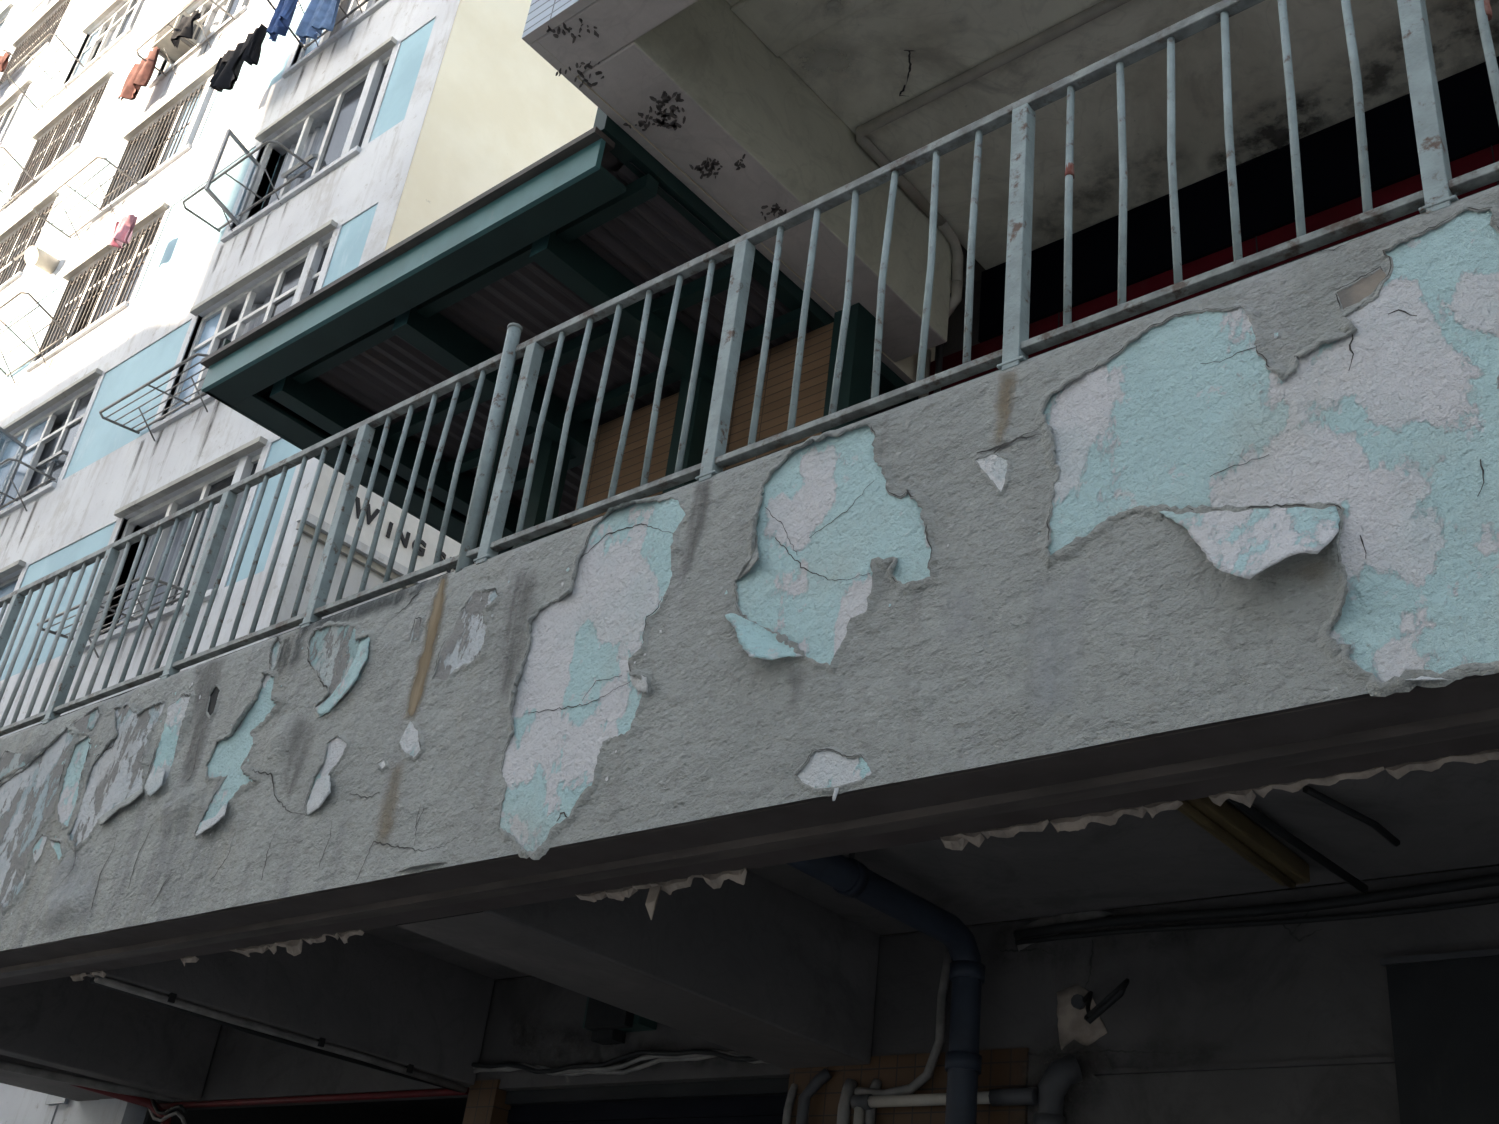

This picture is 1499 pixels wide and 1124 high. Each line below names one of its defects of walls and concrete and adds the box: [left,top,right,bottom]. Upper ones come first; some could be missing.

damp [1214,99,1327,166]
damp [1350,45,1404,102]
damp [1432,0,1499,67]
peeling [972,202,1499,697]
peeling [725,418,949,674]
peeling [0,682,222,916]
peeling [193,620,376,840]
corrosion [408,577,445,716]
peeling [497,493,694,860]
peeling [792,746,875,801]
peeling [940,800,1183,850]
peeling [1209,749,1499,808]